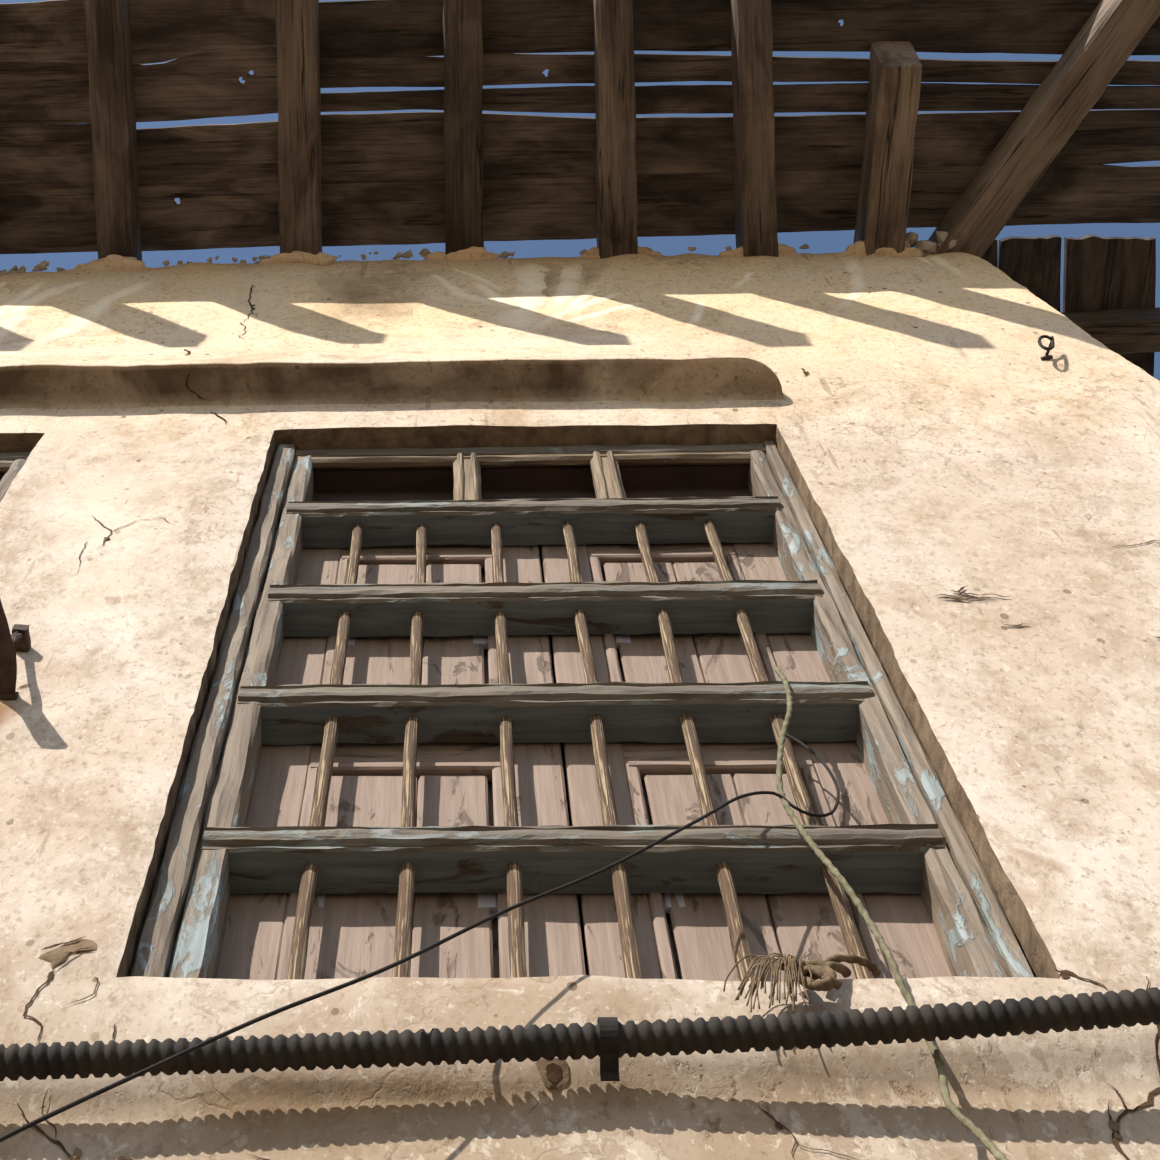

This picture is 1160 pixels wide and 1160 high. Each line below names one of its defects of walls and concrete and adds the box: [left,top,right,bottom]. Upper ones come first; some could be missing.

crack [239,285,258,337]
crack [78,516,179,571]
peeling [39,936,97,969]
crack [23,966,99,1044]
crack [17,1088,81,1160]
crack [1107,1024,1160,1160]